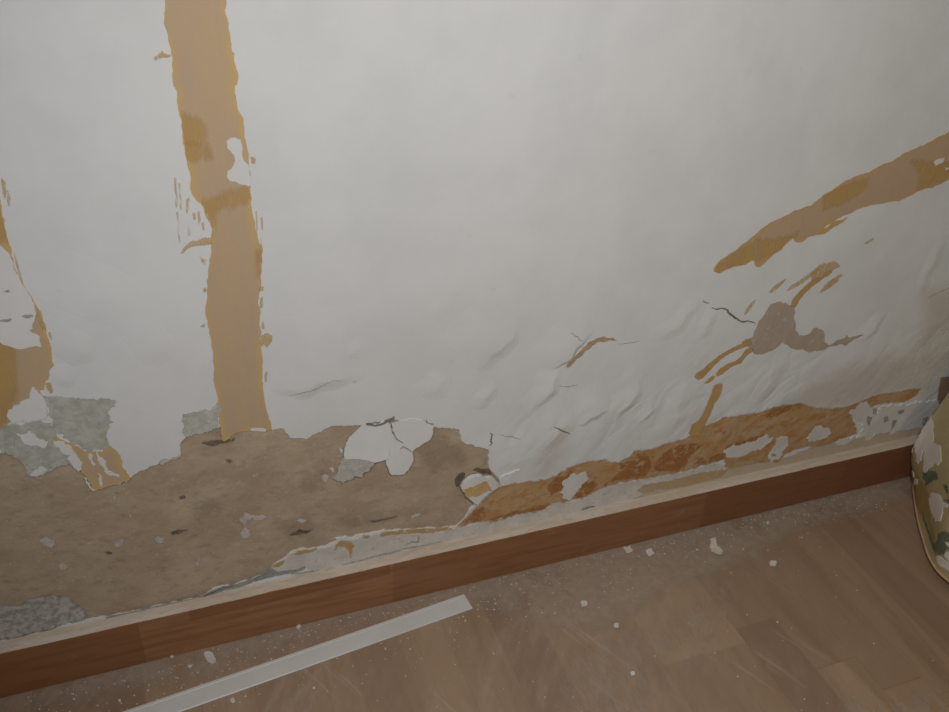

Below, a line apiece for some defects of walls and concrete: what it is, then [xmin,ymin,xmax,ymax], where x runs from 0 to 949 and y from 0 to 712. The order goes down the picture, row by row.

peeling [714,132,949,274]
flaking render [0,0,499,641]
crack [703,301,756,324]
peeling [566,336,615,368]
crack [366,416,412,452]